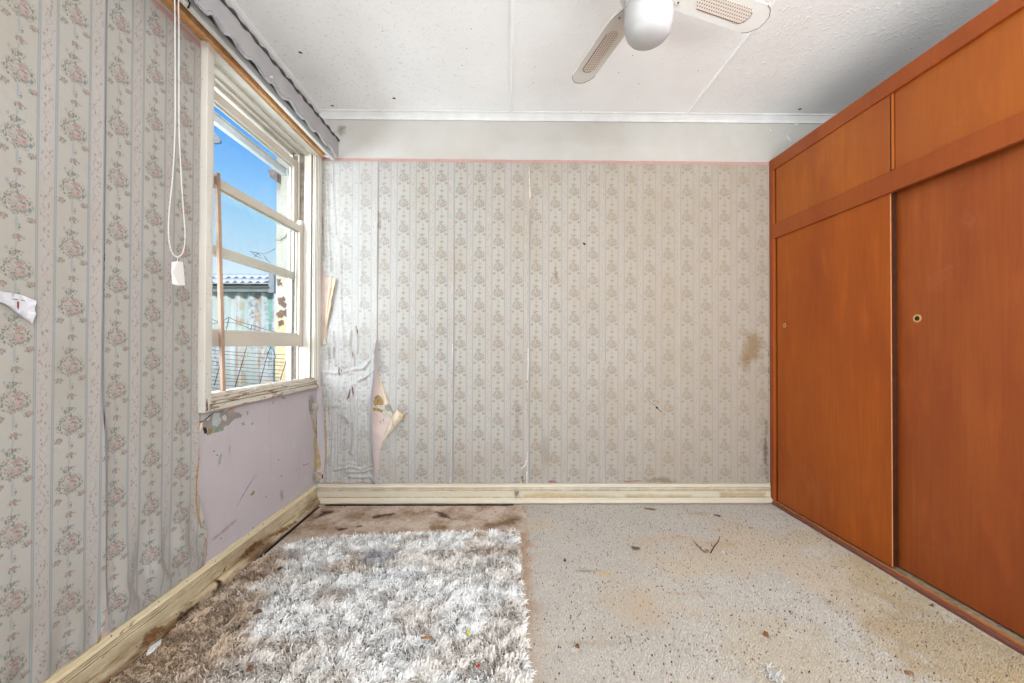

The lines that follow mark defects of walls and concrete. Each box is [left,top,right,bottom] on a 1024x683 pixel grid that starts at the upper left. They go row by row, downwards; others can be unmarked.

peeling [321,265,336,346]
peeling [199,407,253,435]
flaking render [372,373,395,478]